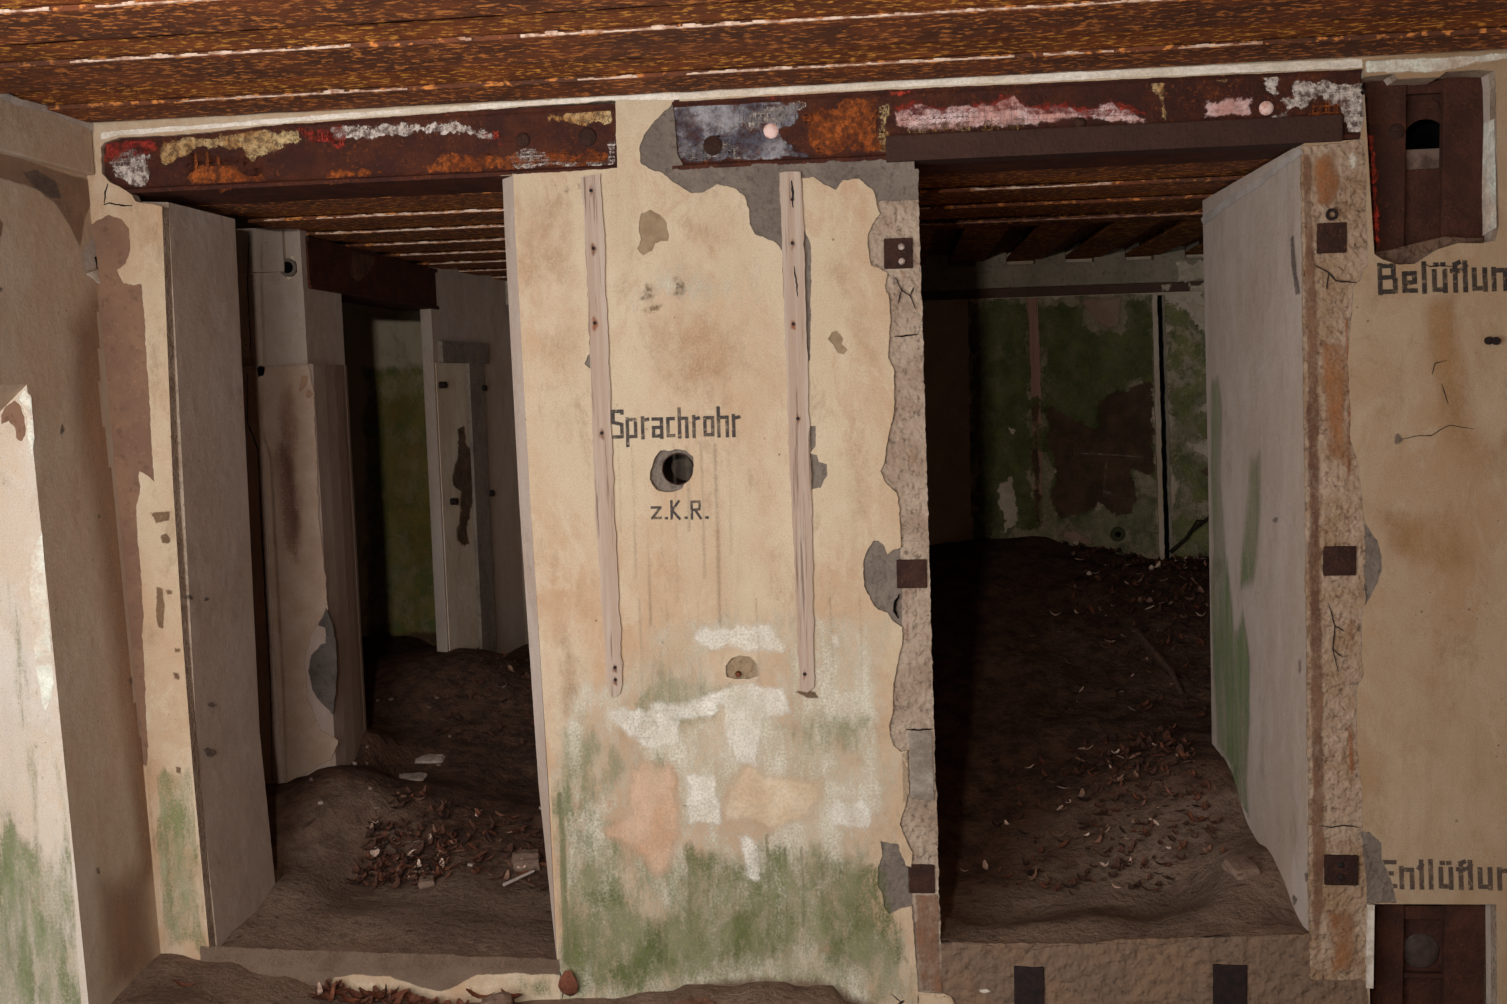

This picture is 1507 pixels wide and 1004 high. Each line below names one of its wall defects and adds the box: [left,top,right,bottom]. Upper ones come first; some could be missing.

peeling [86,215,209,766]
peeling [252,365,338,782]
flaking render [637,99,1483,1004]